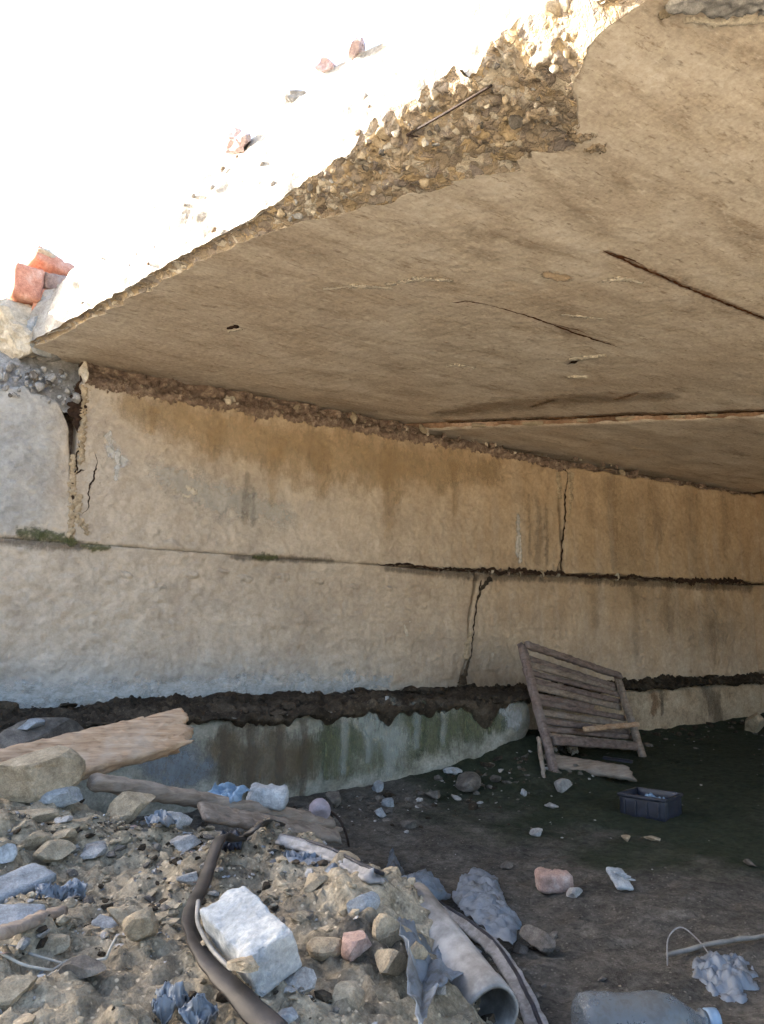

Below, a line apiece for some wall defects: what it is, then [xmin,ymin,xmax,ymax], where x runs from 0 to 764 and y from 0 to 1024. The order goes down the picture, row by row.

spalling [29,0,647,346]
crack [454,301,620,348]
crack [604,251,764,319]
crack [66,384,98,539]
crack [555,469,575,575]
crack [458,576,493,685]
damp [139,725,331,788]
damp [359,702,425,759]